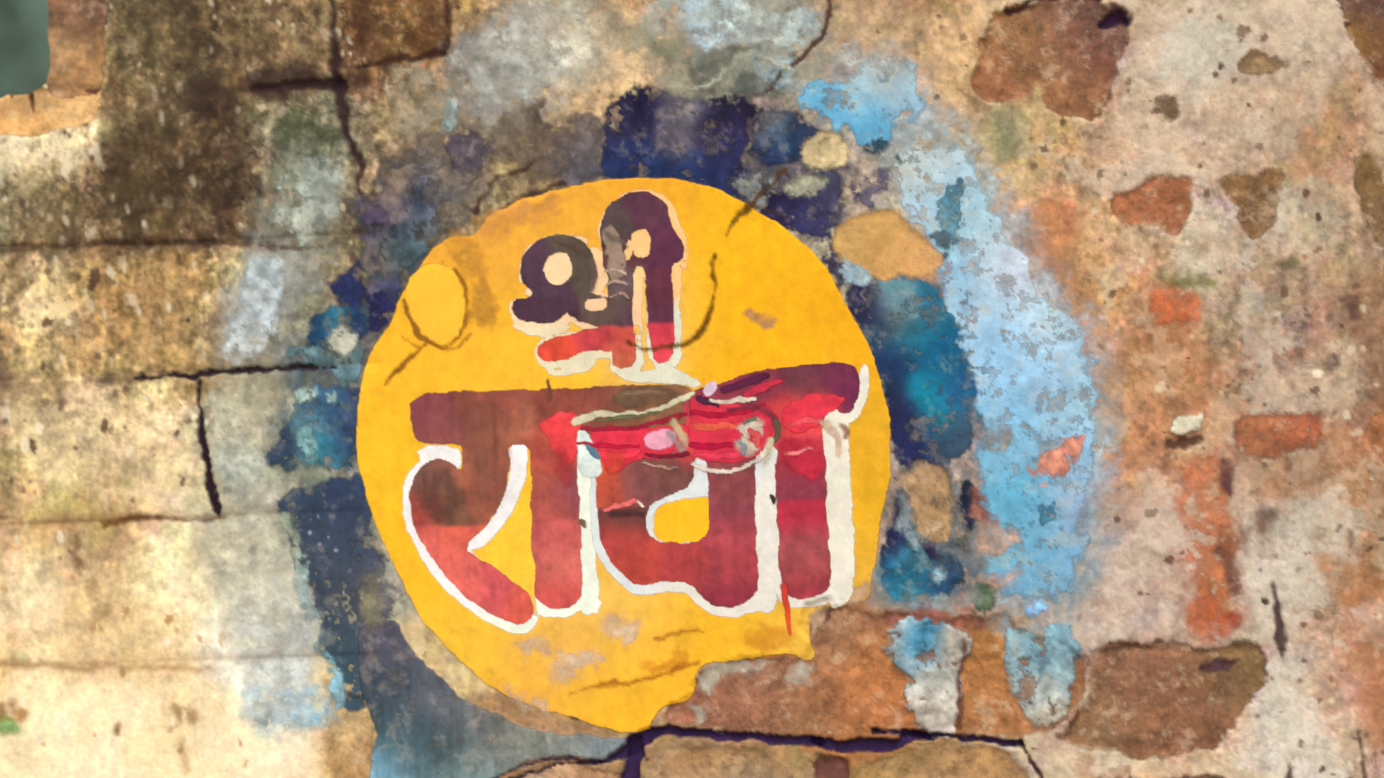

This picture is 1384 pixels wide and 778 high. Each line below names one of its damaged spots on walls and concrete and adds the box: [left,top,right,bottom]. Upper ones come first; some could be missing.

leakage [248,64,316,99]
crack [256,0,450,194]
crack [768,0,832,91]
flaking render [1238,50,1283,75]
flaking render [1337,0,1384,82]
flaking render [1219,168,1284,239]
peeling [209,0,1268,778]
crack [102,364,337,527]